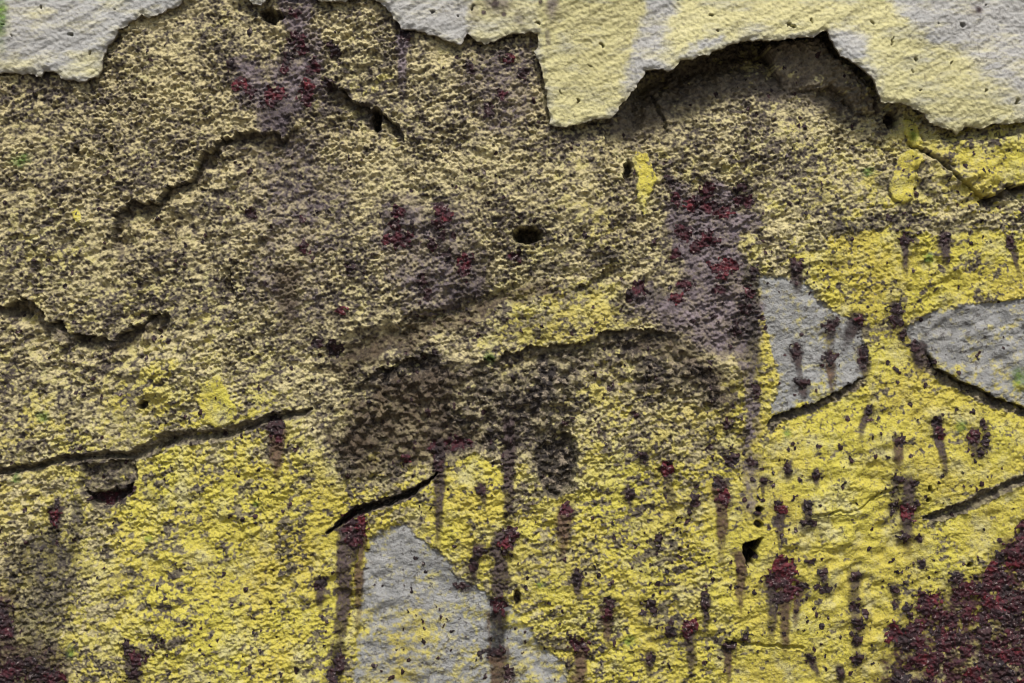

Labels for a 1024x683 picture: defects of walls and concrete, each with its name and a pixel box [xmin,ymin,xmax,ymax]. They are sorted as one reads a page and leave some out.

peeling [0,0,183,83]
spalling [249,0,286,26]
spalling [320,75,405,157]
peeling [375,0,1024,216]
peeling [756,274,869,433]
peeling [906,297,1024,423]
crack [0,406,314,476]
water stain [339,372,459,473]
crack [324,472,437,535]
crack [812,486,899,519]
crack [922,473,1024,522]
peeling [351,523,568,683]